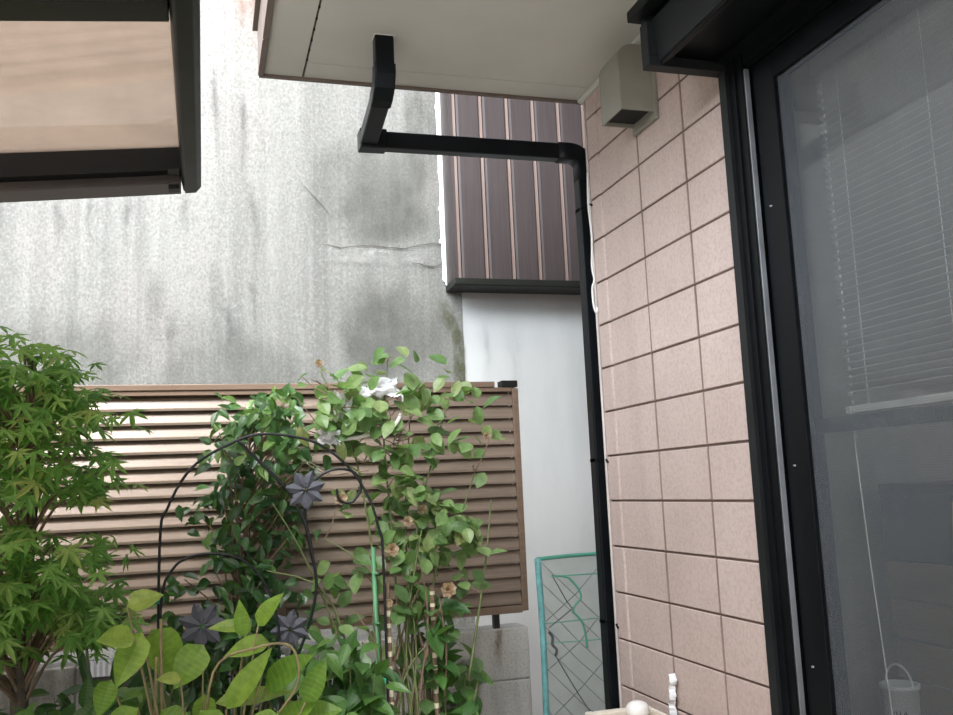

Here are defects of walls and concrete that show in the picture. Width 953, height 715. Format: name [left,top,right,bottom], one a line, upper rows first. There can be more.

crack [320,235,443,268]